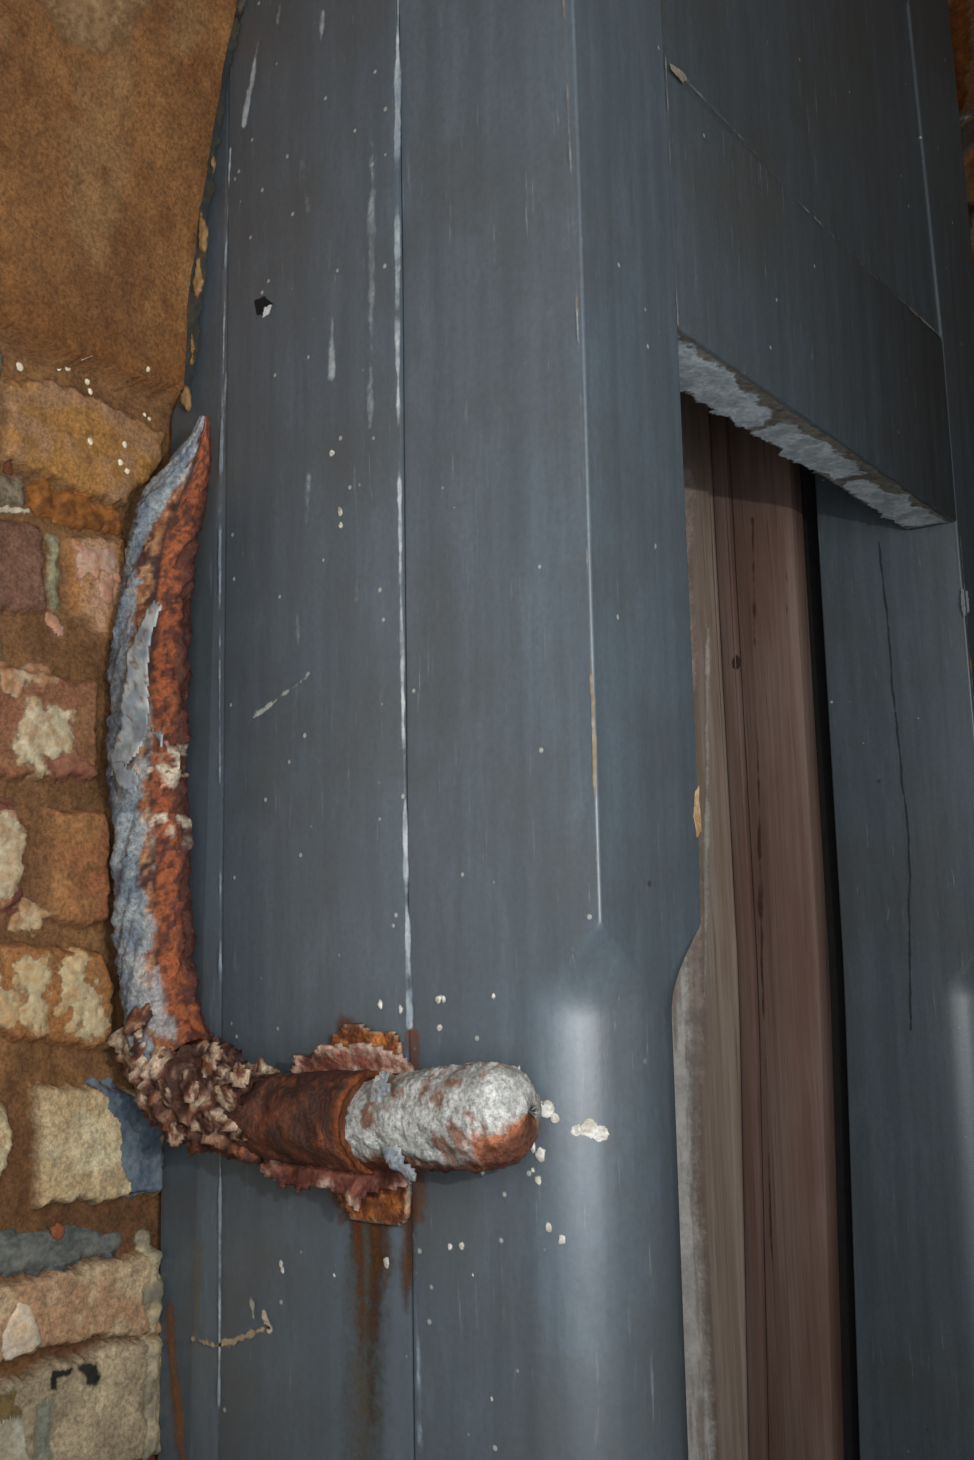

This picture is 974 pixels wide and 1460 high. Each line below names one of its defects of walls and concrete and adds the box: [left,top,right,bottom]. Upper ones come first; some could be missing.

crack [879,544,912,1030]
corrosion [333,1176,423,1339]